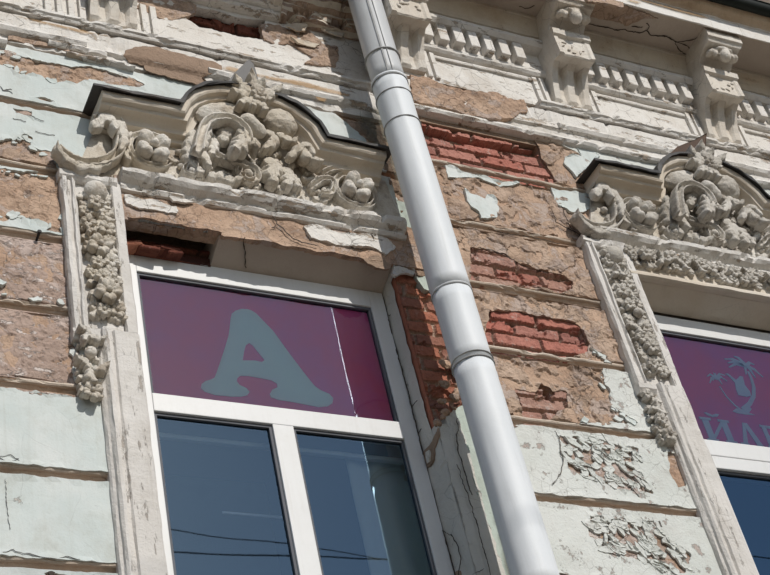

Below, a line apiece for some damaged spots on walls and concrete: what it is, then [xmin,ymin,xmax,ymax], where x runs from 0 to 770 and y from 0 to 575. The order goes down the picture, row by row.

spalling [0,35,222,87]
flaking render [137,0,346,68]
crack [590,23,696,54]
flaking render [338,115,377,144]
flaking render [0,134,63,234]
flaking render [0,235,80,388]
flaking render [408,74,653,497]
flaking render [303,224,462,468]
crack [442,420,491,575]
peeling [668,453,685,487]
crack [6,549,78,560]
peeling [581,514,695,575]